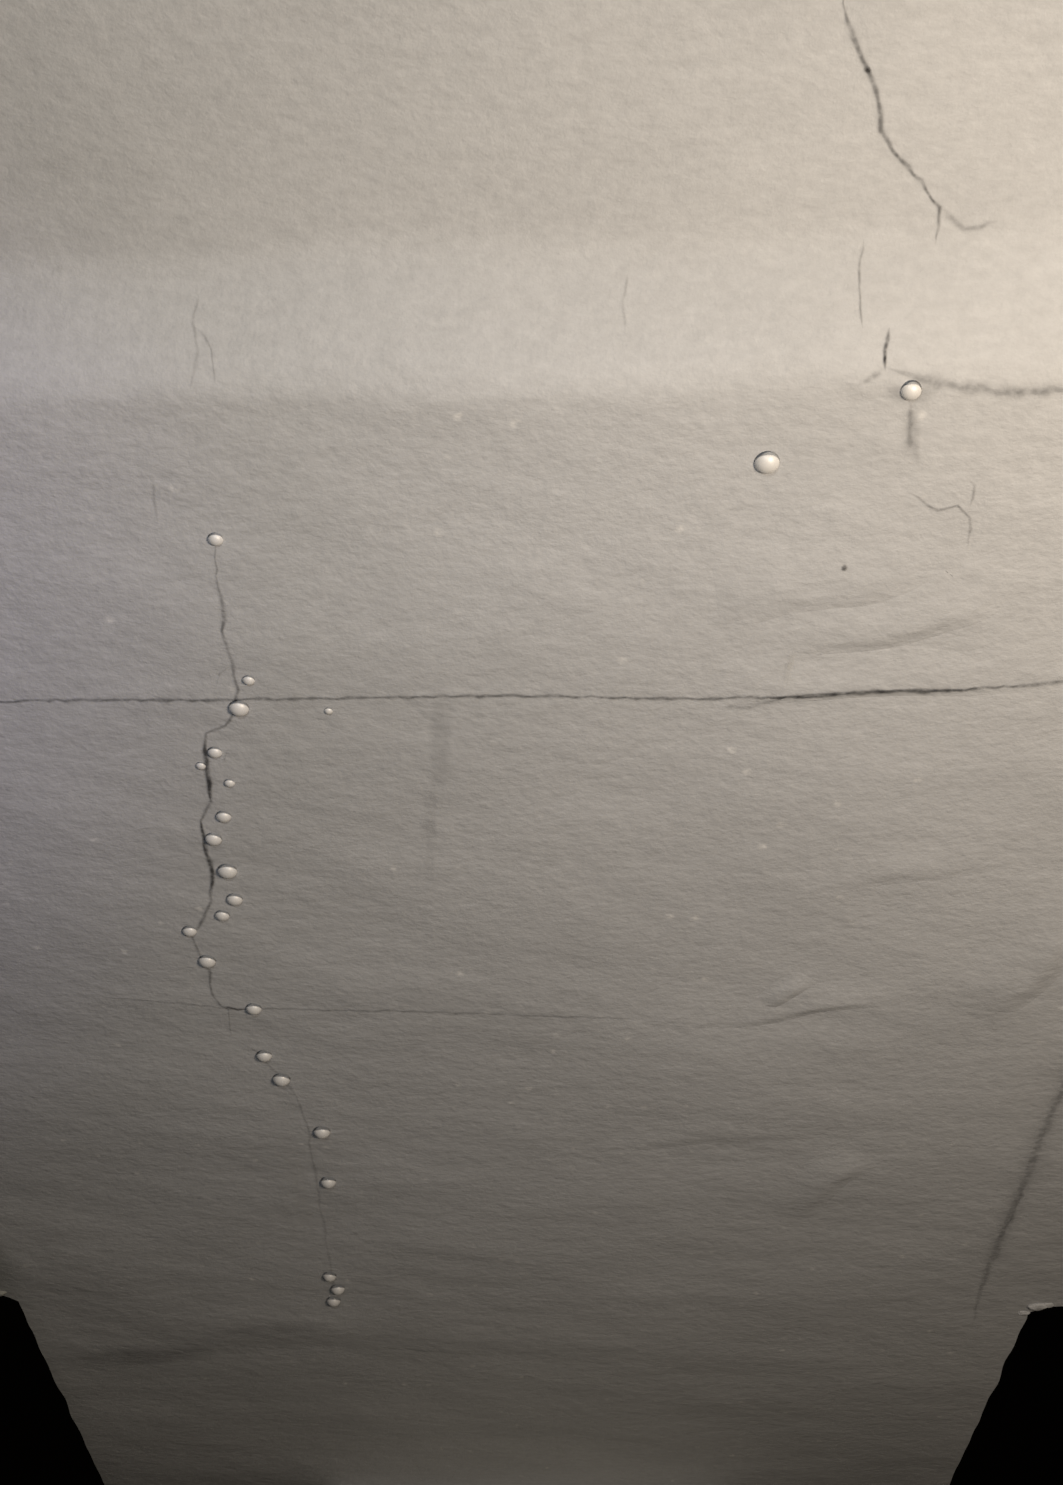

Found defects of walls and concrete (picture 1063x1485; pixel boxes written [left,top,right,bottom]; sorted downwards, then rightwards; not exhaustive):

crack [201,751,213,873]